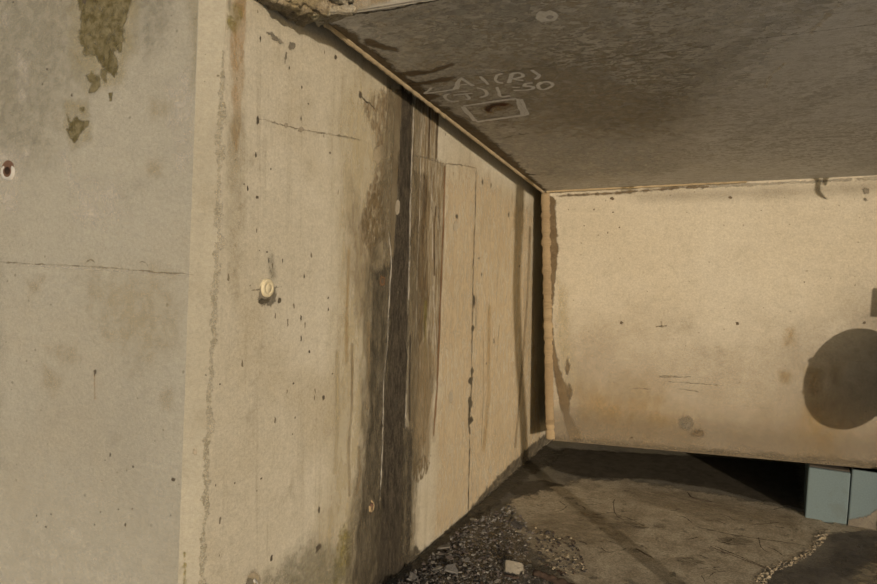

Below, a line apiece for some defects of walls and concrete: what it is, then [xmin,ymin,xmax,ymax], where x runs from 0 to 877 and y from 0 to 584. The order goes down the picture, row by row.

peeling [86,43,122,93]
damp [319,0,877,584]